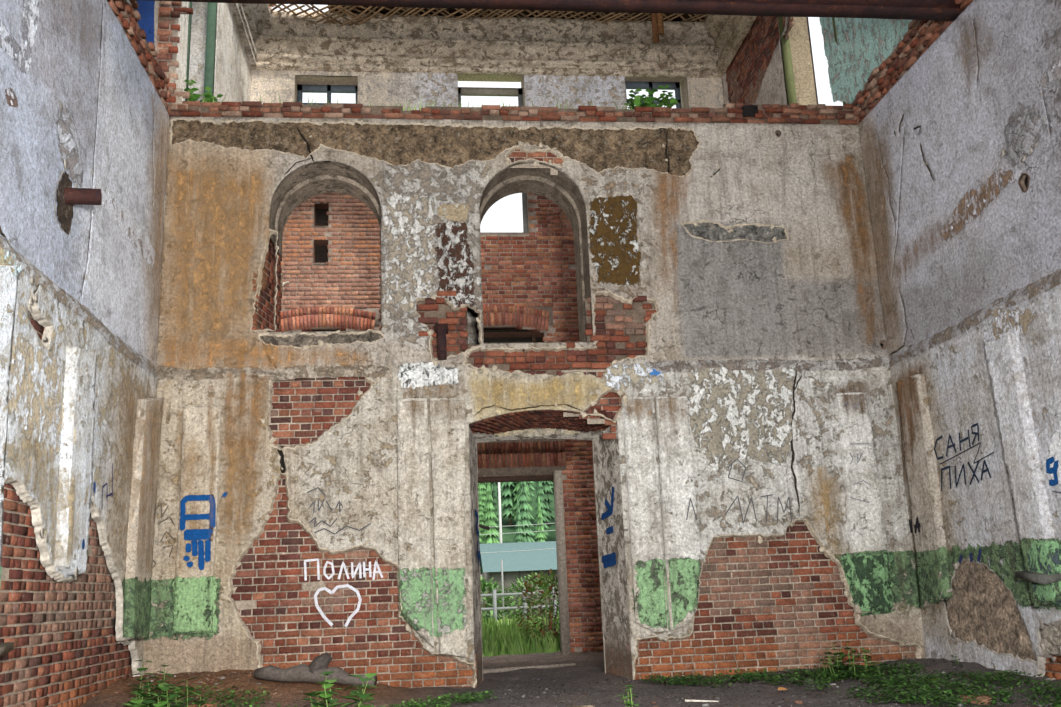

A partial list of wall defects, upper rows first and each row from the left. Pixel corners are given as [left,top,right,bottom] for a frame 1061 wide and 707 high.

flaking render [250,228,385,351]
flaking render [381,191,668,440]
flaking render [260,363,380,450]
peeling [687,367,794,471]
crack [790,370,805,516]
flaking render [0,476,141,707]
flaking render [172,472,477,688]
flaking render [628,519,922,680]
flaking render [939,540,1061,680]